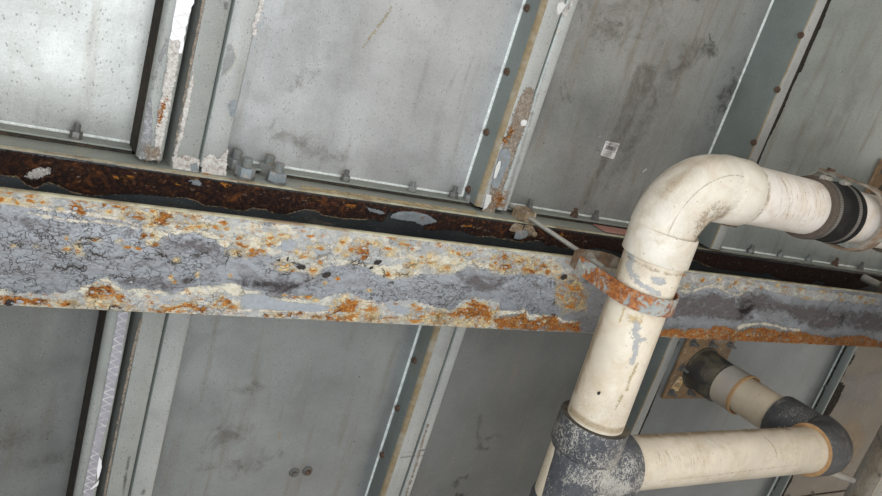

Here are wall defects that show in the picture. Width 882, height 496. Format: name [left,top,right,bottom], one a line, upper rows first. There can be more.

rust [482,87,534,214]
rust [0,191,88,215]
rust [102,203,476,277]
peeling [0,167,583,280]
rust [0,279,131,309]
rust [148,295,247,313]
peeling [0,275,500,329]
rust [264,254,591,332]
peeling [678,260,880,306]
rust [659,321,882,348]